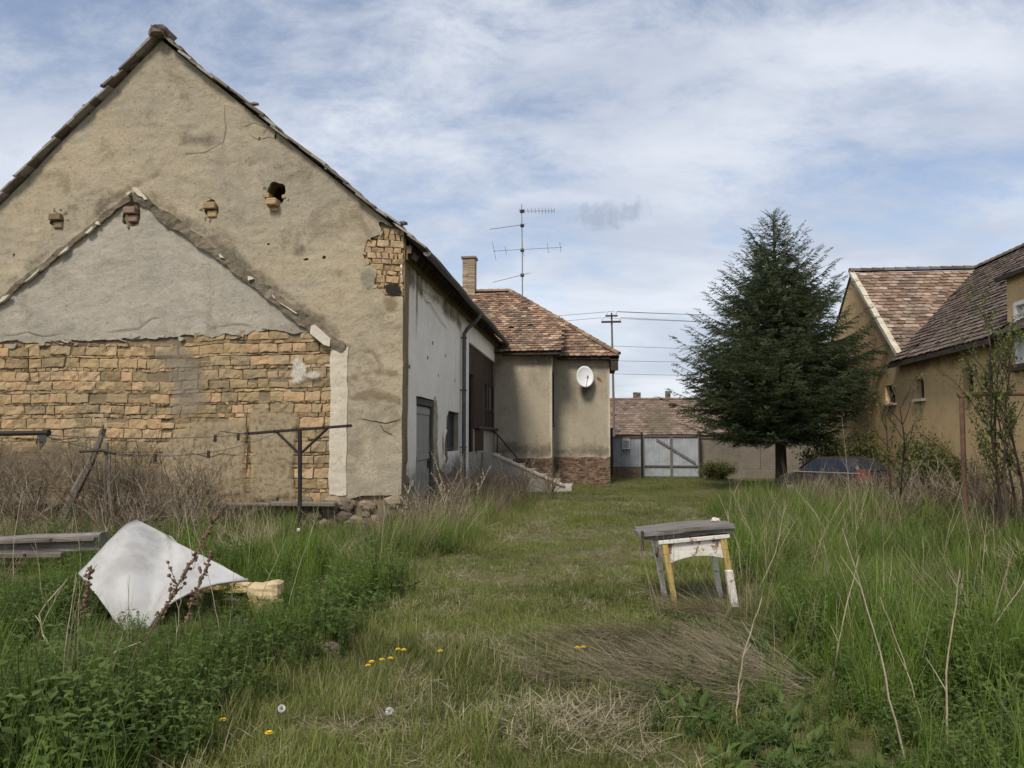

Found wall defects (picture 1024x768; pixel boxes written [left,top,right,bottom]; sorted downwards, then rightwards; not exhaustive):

crack [182,108,285,155]
spalling [263,186,289,212]
flaking render [362,228,405,310]
flaking render [0,325,331,502]